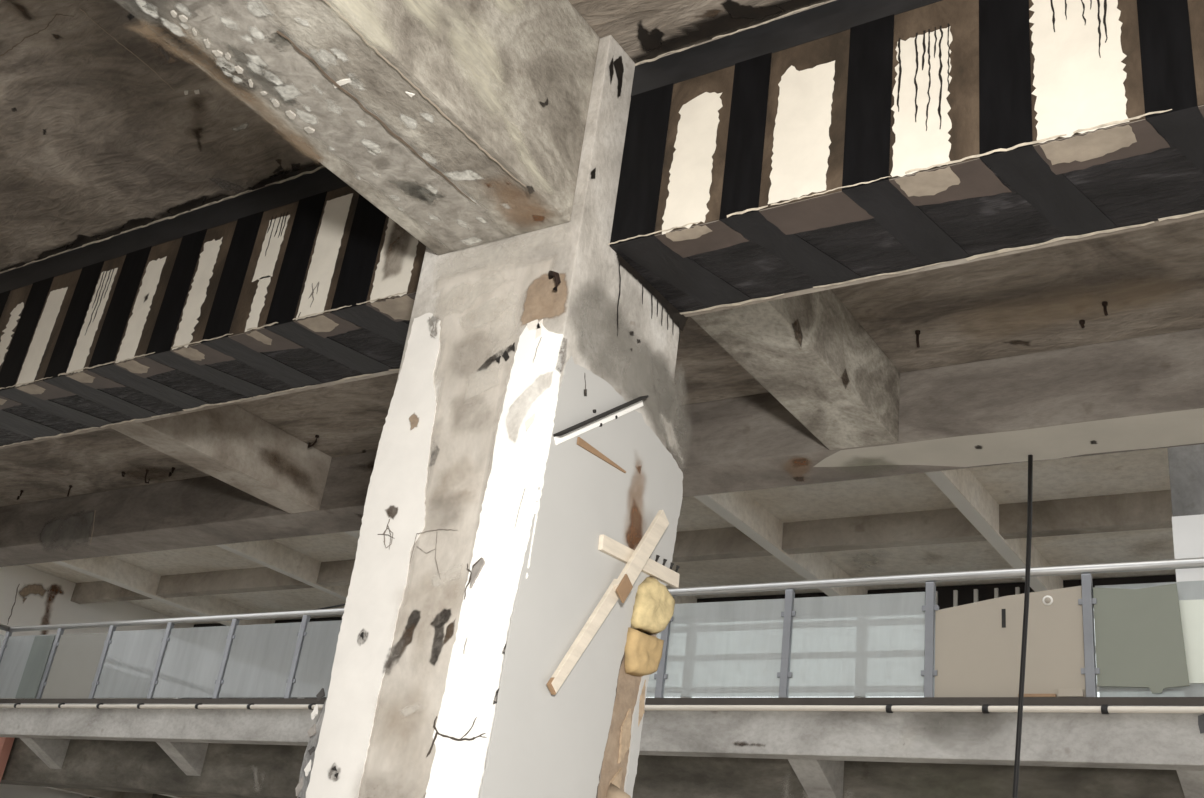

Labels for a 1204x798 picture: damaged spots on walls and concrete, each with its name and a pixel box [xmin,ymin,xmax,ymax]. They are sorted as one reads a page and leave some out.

peeling [127,0,503,251]
water stain [609,0,826,97]
water stain [897,23,950,131]
water stain [1050,0,1108,58]
peeling [359,258,567,798]
peeling [19,584,46,602]
crack [426,716,487,757]